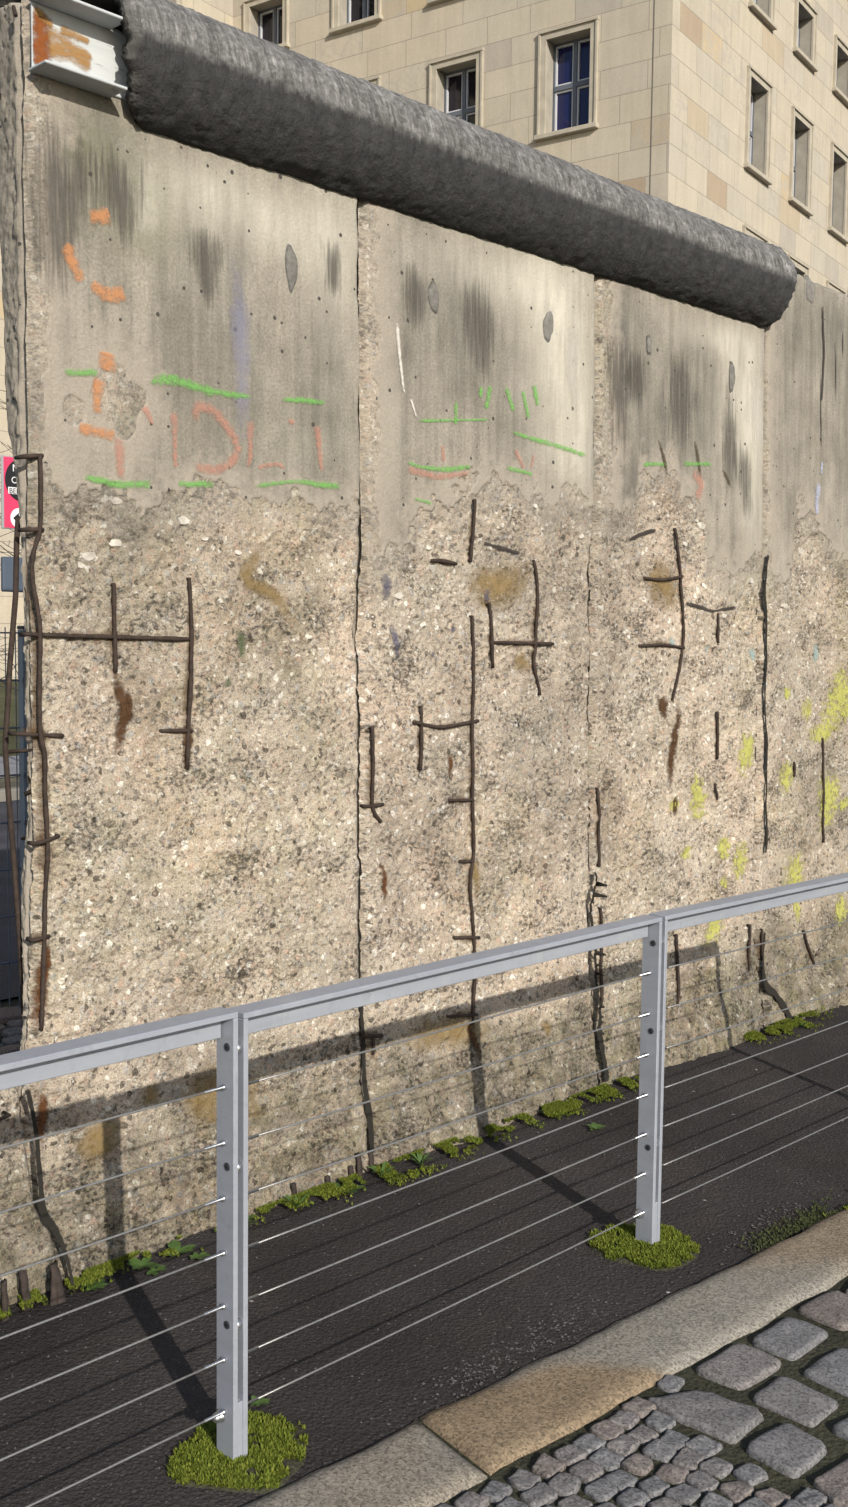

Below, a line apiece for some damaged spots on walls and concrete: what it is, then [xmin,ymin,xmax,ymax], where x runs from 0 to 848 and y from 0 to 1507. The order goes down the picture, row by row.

corrosion [33,8,91,69]
spalling [2,0,848,1050]
corrosion [114,681,132,749]
corrosion [183,727,194,767]
spalling [248,938,643,1216]
corrosion [37,1095,48,1136]
spalling [20,1039,217,1281]